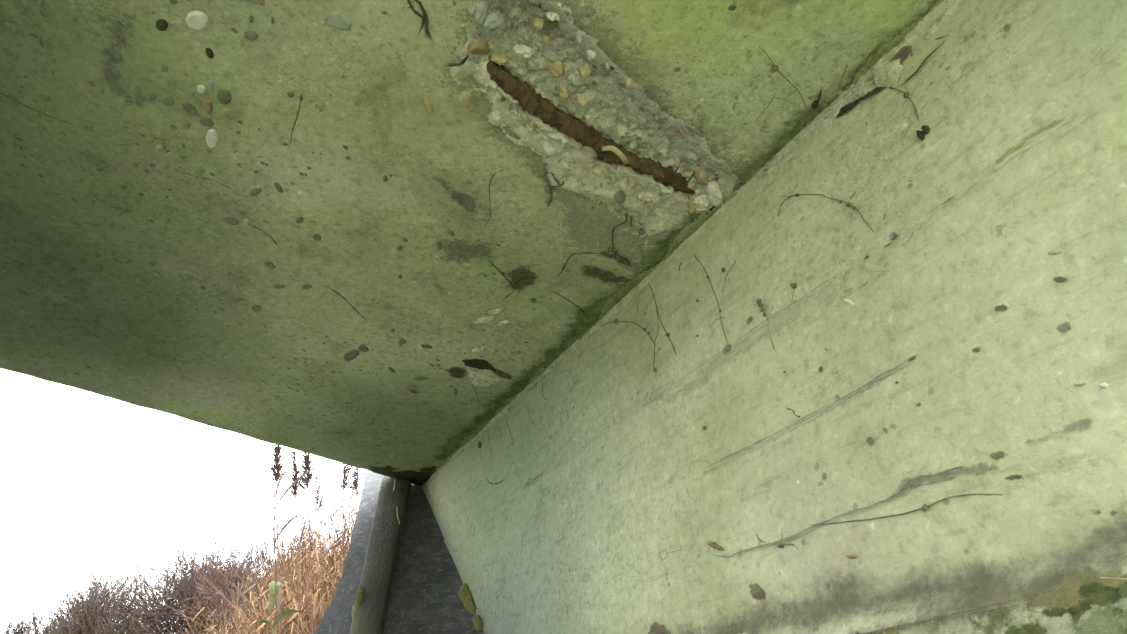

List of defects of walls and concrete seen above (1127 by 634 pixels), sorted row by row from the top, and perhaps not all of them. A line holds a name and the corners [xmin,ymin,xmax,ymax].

spalling [442,0,751,251]
water stain [648,623,670,634]
water stain [715,522,1127,634]